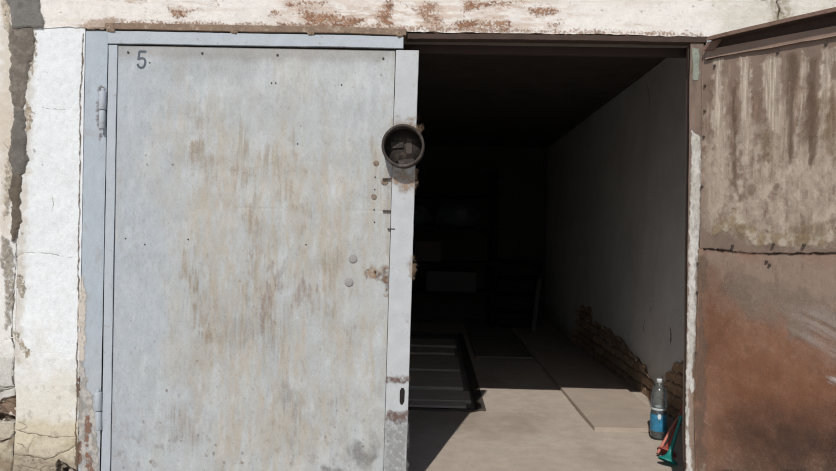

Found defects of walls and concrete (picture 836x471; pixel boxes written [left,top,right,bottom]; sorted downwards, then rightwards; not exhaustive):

rust [120,9,279,26]
rust [281,0,530,33]
rust [528,7,565,34]
leakage [702,50,836,248]
crack [0,33,84,471]
peeling [56,277,99,471]
rust [386,411,408,424]
flaking render [569,130,701,471]